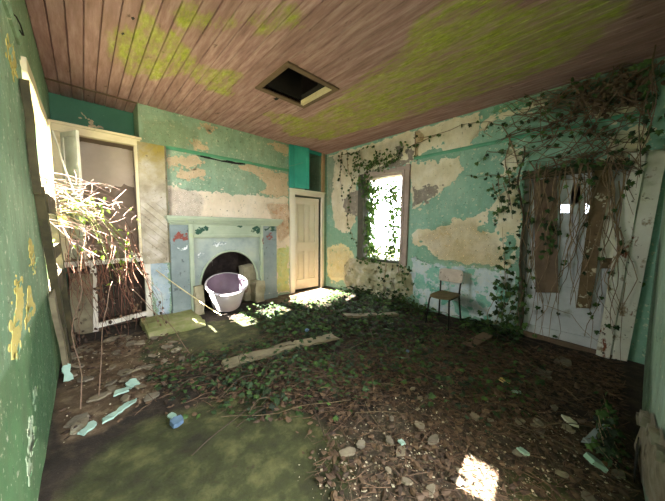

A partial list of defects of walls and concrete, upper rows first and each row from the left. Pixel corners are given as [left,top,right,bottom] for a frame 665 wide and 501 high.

peeling [28,238,39,275]
crack [197,155,245,165]
peeling [166,123,290,270]
peeling [327,243,354,284]
peeling [329,96,549,233]
peeling [410,145,527,326]
peeling [8,275,36,361]